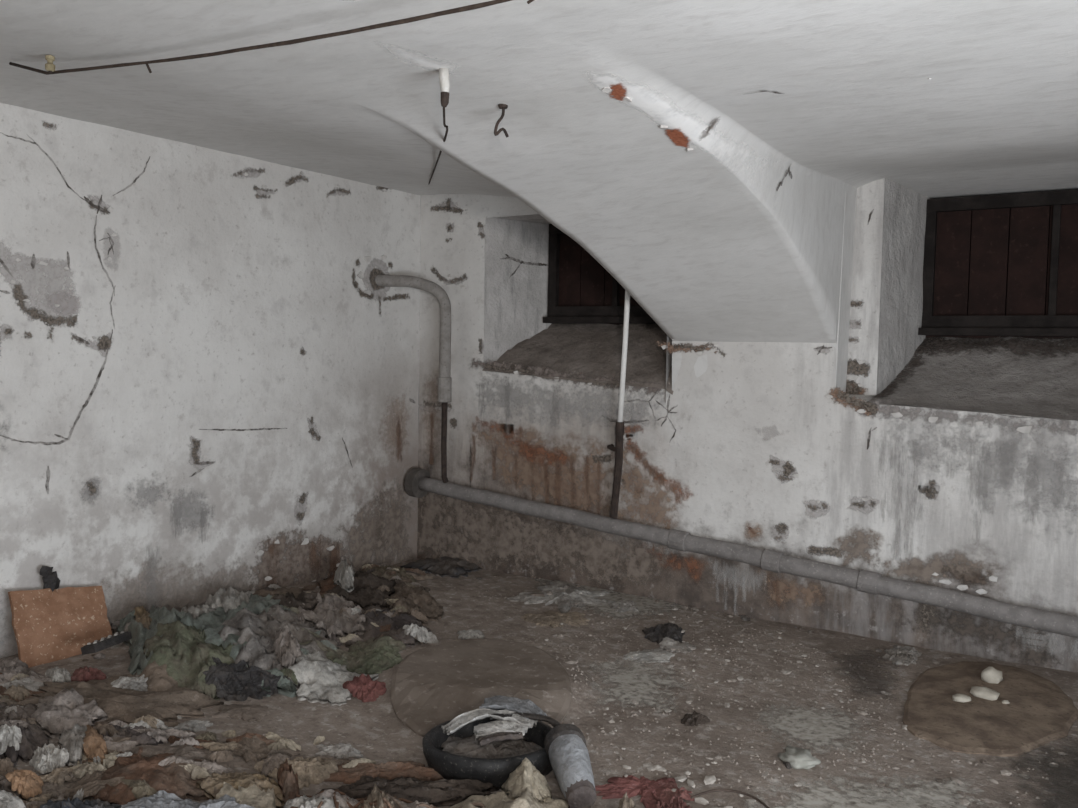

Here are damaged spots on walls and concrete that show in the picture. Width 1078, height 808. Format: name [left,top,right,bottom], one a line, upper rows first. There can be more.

spalling [602,84,632,102]
spalling [659,119,719,152]
crack [5,135,115,340]
spalling [0,243,112,356]
spalling [849,320,861,343]
crack [21,365,105,491]
rust [471,417,690,530]
spalling [770,455,799,483]
spalling [919,480,939,500]
leakage [109,559,252,620]